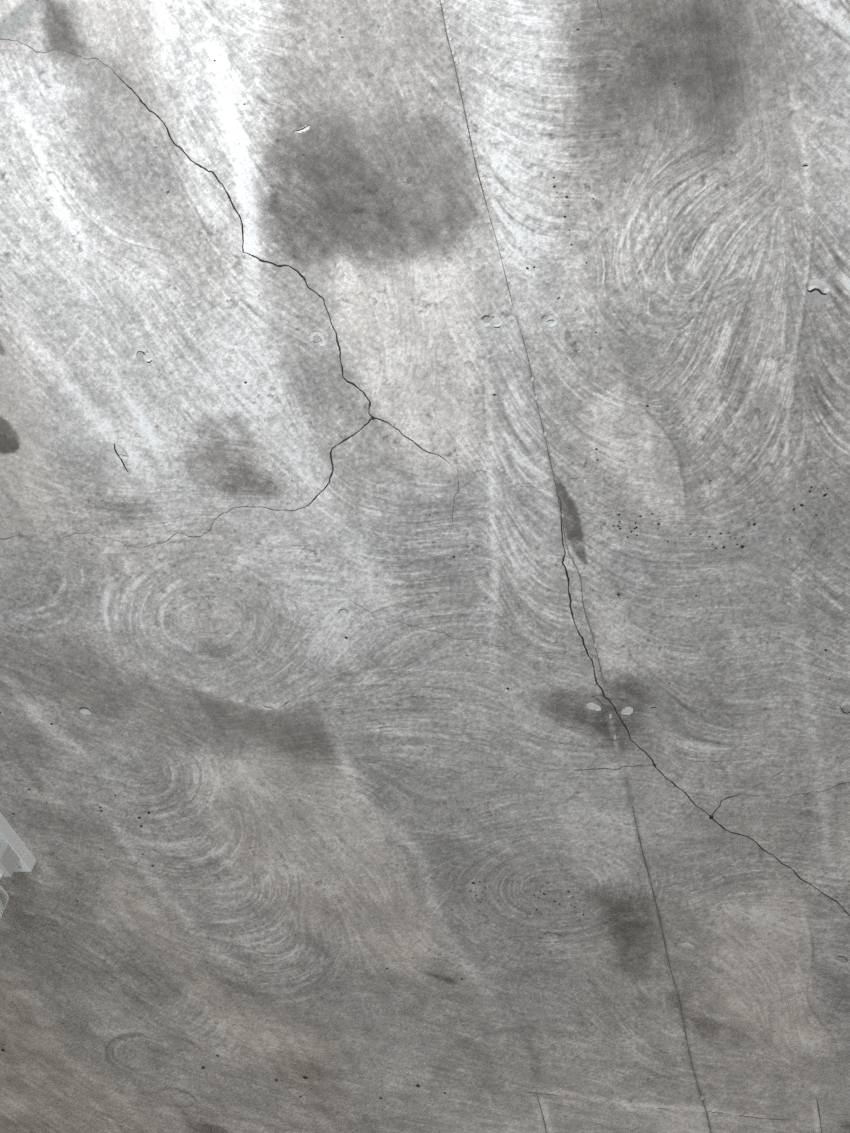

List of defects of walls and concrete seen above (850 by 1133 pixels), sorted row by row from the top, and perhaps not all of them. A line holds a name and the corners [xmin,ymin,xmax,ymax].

leakage [0,417,18,453]
crack [0,39,486,548]
leakage [557,483,586,564]
crack [351,486,850,916]